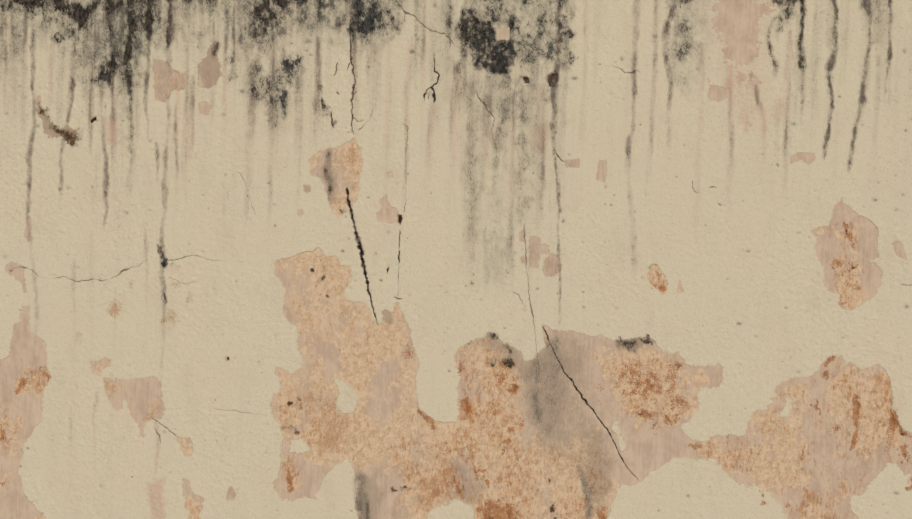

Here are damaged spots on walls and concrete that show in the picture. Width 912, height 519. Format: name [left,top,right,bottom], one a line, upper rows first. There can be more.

damp [38,78,79,146]
damp [0,0,174,120]
spalling [153,43,222,102]
damp [251,55,303,114]
damp [446,0,575,139]
damp [768,0,807,71]
spalling [303,138,362,217]
crack [346,188,405,322]
spalling [812,198,883,310]
spalling [0,306,50,519]
crack [518,290,638,479]
spalling [271,248,912,519]